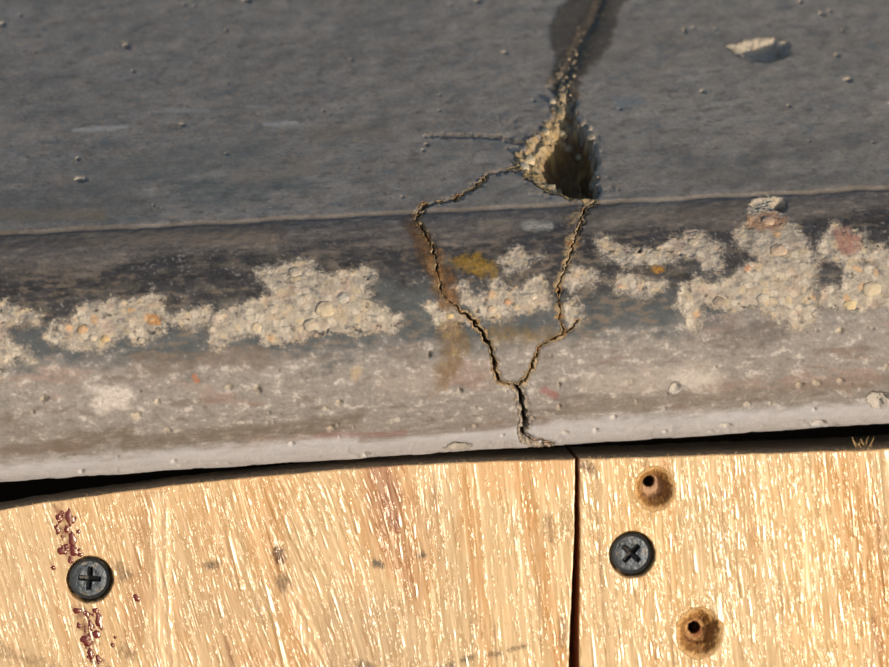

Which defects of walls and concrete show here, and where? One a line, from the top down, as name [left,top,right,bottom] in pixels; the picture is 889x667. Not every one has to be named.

crack [546,56,580,127]
leakage [551,0,626,111]
spalling [0,256,404,383]
crack [412,164,599,448]
spalling [421,194,889,339]